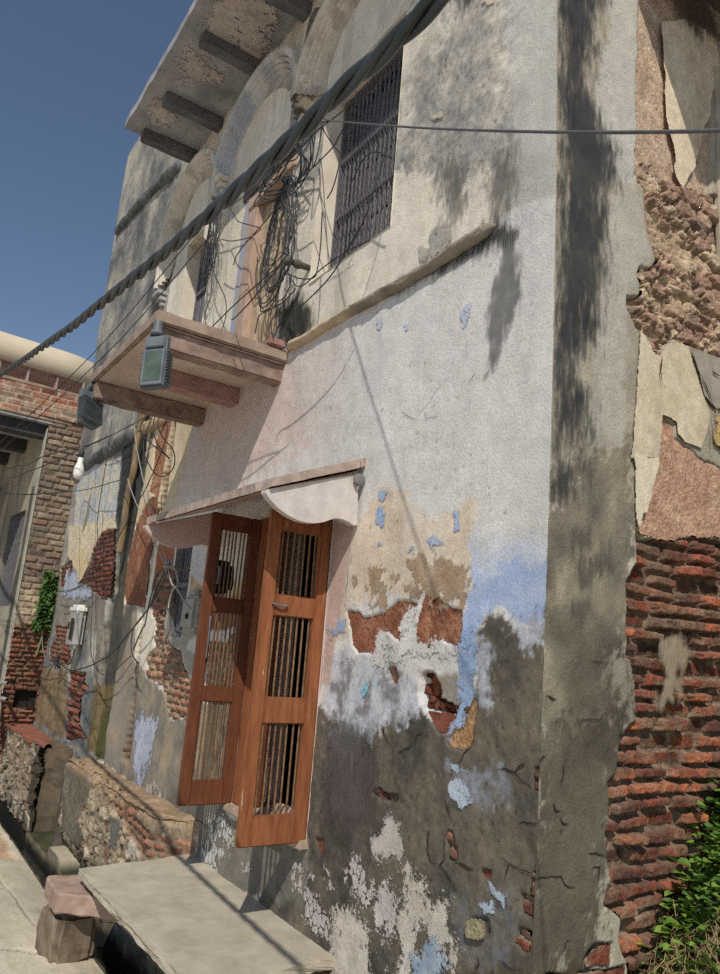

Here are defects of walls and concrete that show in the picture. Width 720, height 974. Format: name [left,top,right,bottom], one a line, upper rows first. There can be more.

peeling [199,0,280,59]
damp [552,0,622,500]
damp [276,293,313,346]
spalling [578,0,720,974]
spalling [49,626,88,740]
spalling [61,421,191,798]
spalling [327,536,479,749]
peeling [290,788,508,974]
crack [427,801,475,886]
peeling [448,763,474,810]
crack [499,755,565,787]
crack [503,852,605,896]